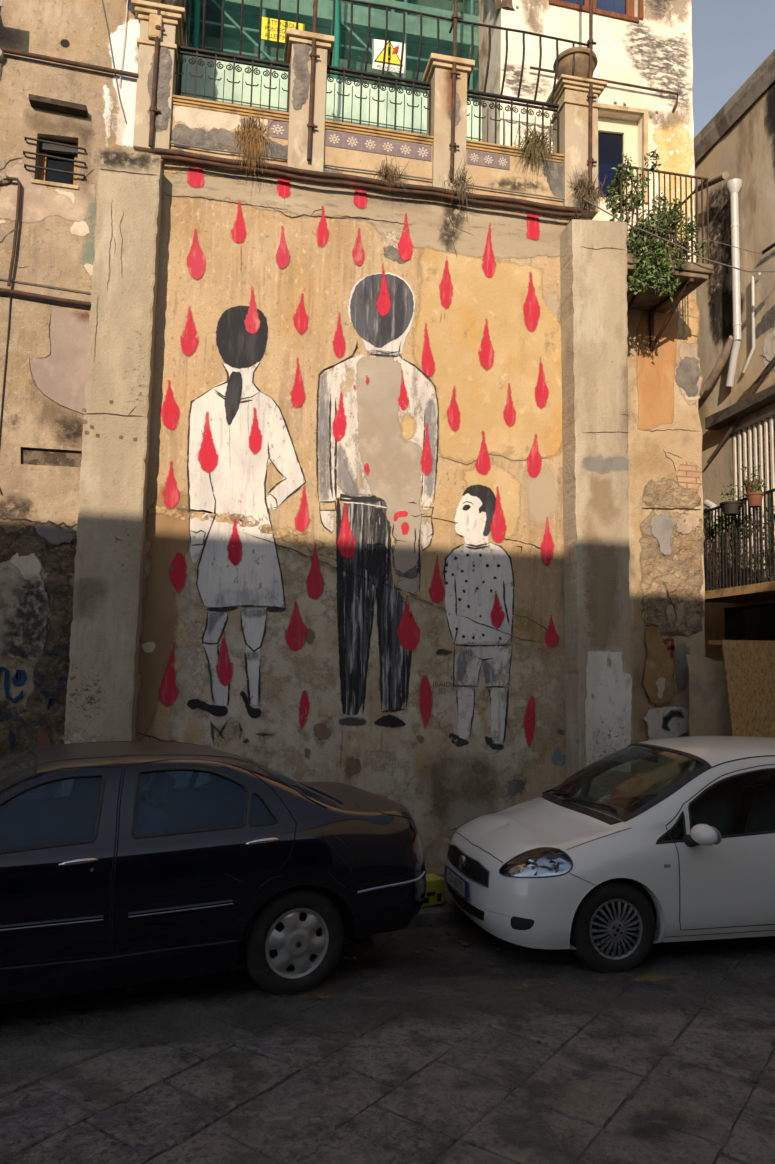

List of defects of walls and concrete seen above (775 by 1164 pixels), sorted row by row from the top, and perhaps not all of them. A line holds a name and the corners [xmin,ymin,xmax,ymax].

peeling [103,84,114,145]
damp [648,91,687,128]
damp [765,80,775,164]
crack [83,169,409,225]
flaking render [653,116,695,241]
crack [94,203,124,357]
flaking render [755,305,775,374]
spalling [639,462,705,638]
spalling [0,520,101,763]